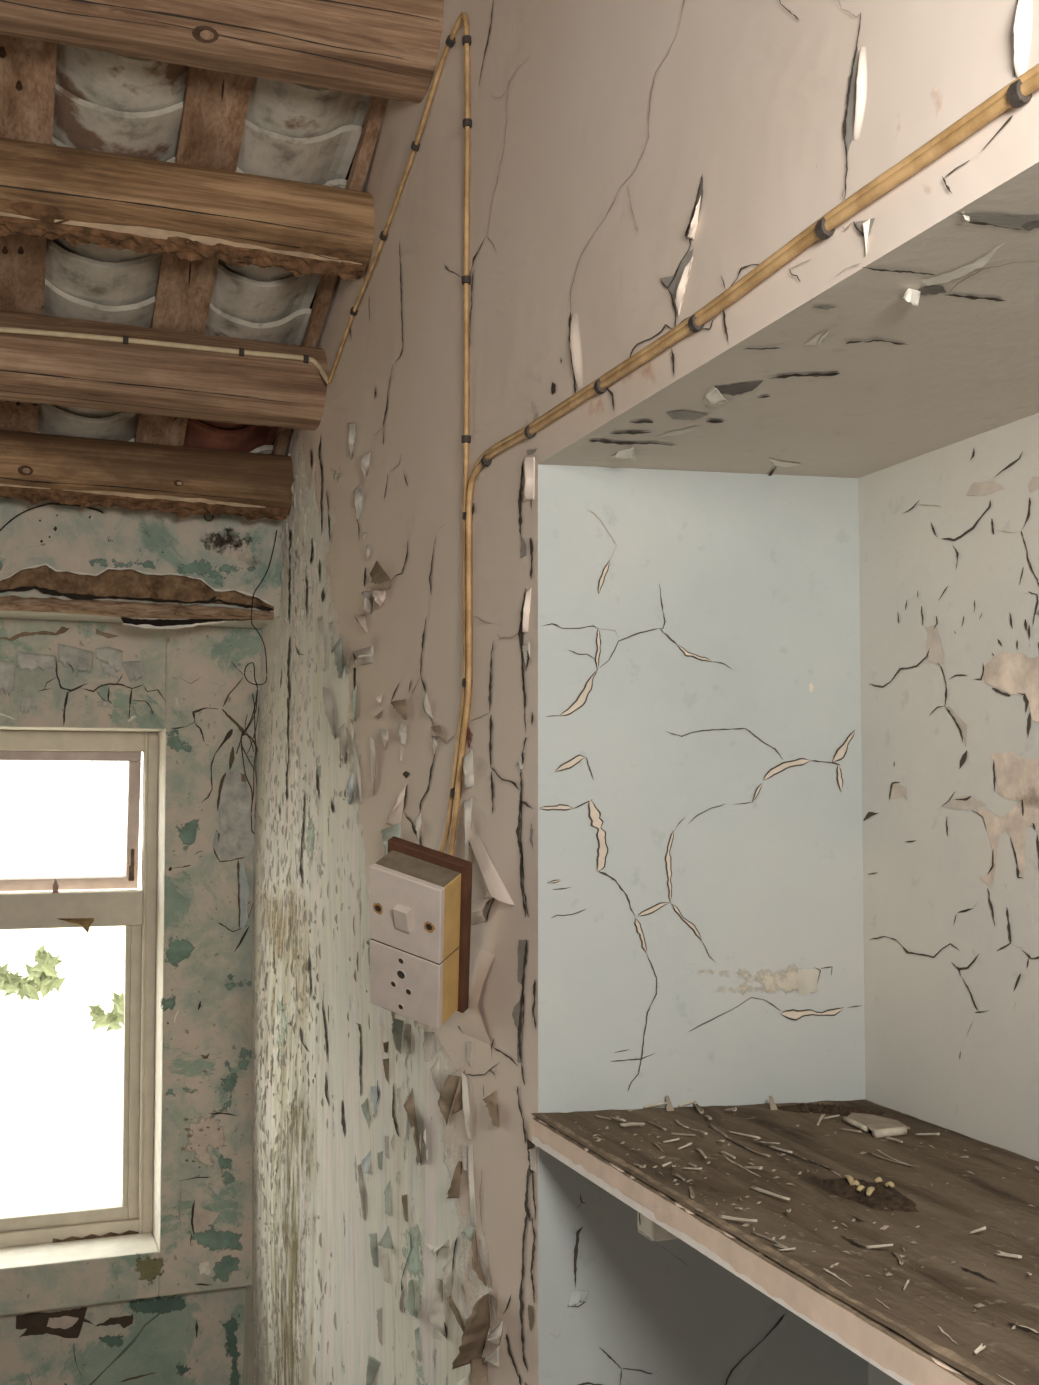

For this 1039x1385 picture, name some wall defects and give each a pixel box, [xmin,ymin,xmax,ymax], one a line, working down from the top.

crack [838,0,867,200]
crack [1013,0,1033,78]
peeling [838,213,1039,307]
flaking render [0,423,453,883]
mould [203,528,252,553]
peeling [463,449,537,917]
crack [871,449,1039,806]
crack [539,728,858,1090]
crack [872,890,1039,1059]
peeling [356,939,537,1385]
peeling [16,1296,186,1347]
mould [135,1254,164,1285]